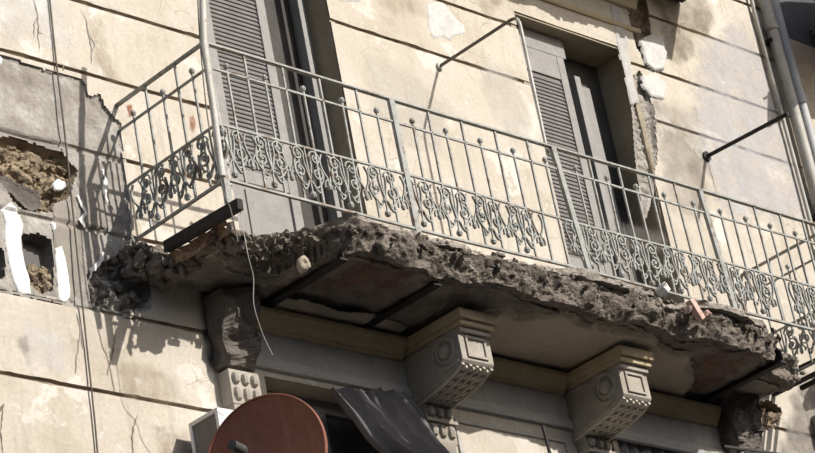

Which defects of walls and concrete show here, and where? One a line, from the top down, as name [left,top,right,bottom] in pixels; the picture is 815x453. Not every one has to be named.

crack [33,2,42,48]
crack [84,15,95,63]
flaking render [627,0,652,55]
flaking render [0,51,152,319]
crack [75,314,84,373]
spalling [188,217,799,432]
crack [0,404,8,453]